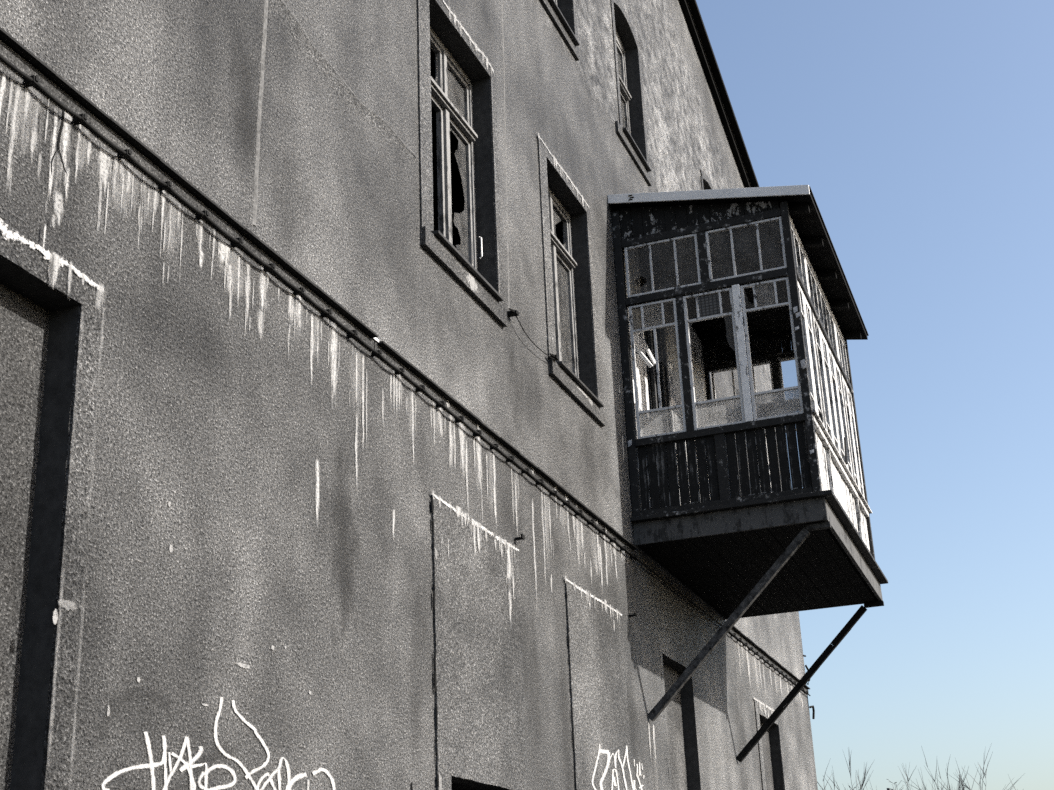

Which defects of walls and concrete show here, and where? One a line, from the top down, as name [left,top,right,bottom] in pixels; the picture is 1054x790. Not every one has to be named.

efflorescence [0,72,30,185]
efflorescence [0,103,183,303]
efflorescence [196,222,340,394]
efflorescence [355,353,367,479]
efflorescence [382,375,416,461]
efflorescence [431,400,519,620]
efflorescence [532,486,628,631]